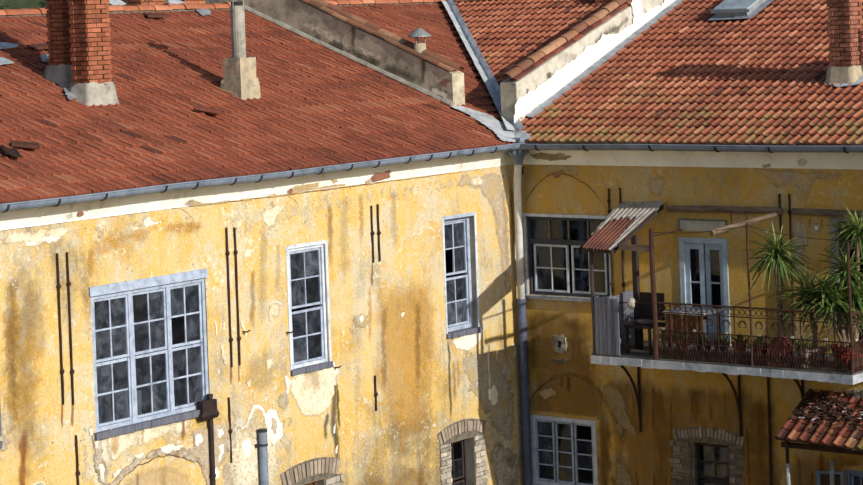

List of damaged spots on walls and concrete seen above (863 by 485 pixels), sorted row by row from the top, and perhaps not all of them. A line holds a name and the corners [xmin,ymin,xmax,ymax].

flaking render [79,362,339,485]
flaking render [450,325,519,485]